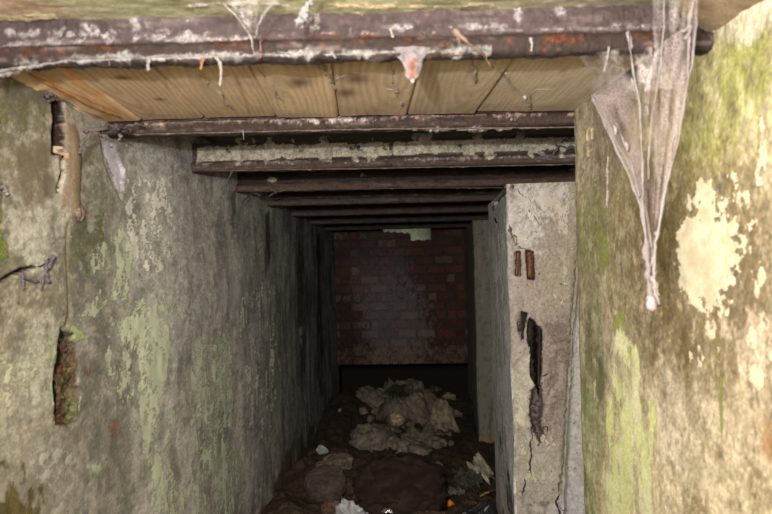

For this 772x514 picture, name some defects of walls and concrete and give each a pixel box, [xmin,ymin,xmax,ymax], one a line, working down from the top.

leakage [461,22,505,30]
spalling [51,101,70,163]
peeling [754,116,769,186]
crack [0,263,45,282]
peeling [50,137,184,514]
peeling [188,280,281,514]
spalling [515,322,571,483]
crack [516,243,577,514]
peeling [674,170,758,373]
peeling [751,261,766,299]